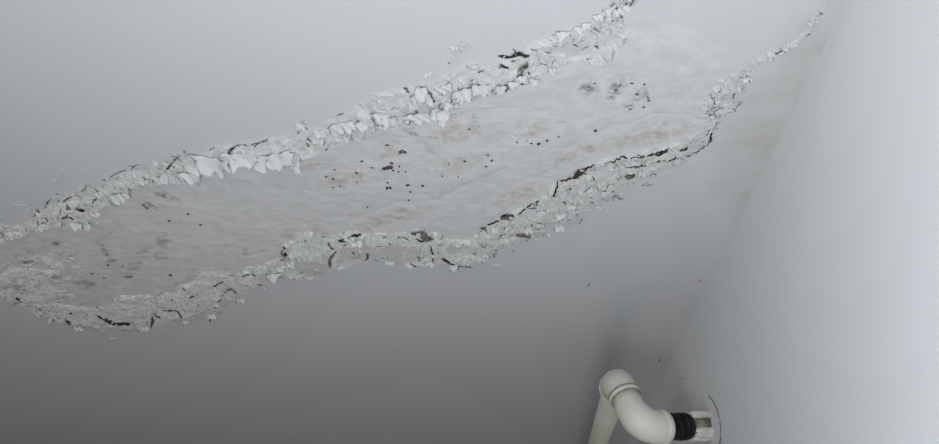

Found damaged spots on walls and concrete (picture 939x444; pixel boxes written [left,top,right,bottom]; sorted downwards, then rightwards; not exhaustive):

peeling [0,0,638,342]
peeling [474,69,754,266]